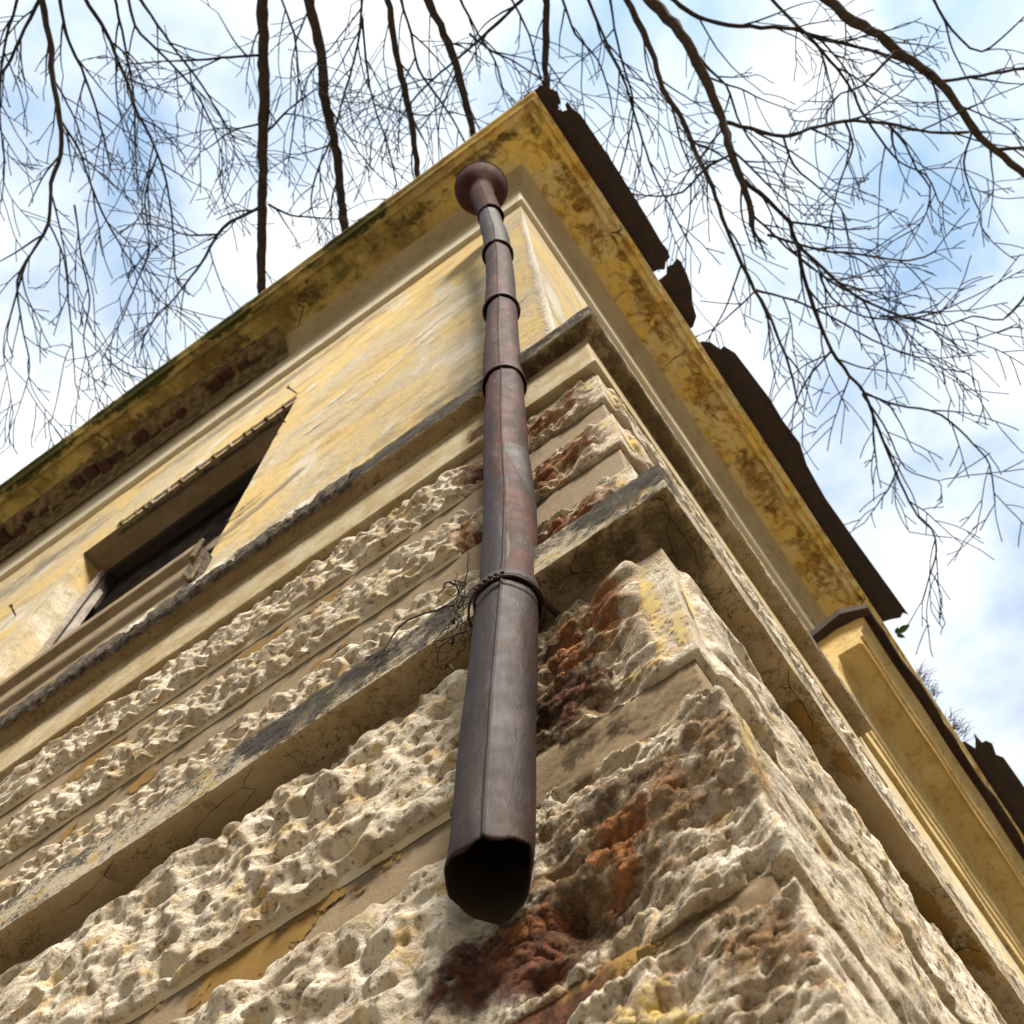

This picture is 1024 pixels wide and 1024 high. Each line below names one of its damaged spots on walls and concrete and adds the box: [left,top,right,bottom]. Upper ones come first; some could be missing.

water stain [451,122,540,176]
water stain [550,146,667,341]
spalling [0,472,352,731]
water stain [216,585,477,772]
water stain [336,371,482,482]
rust [532,427,609,500]
rust [539,483,615,541]
rust [536,574,631,739]
crack [617,498,704,575]
water stain [736,450,780,523]
rust [582,709,787,934]
rust [424,881,625,1024]